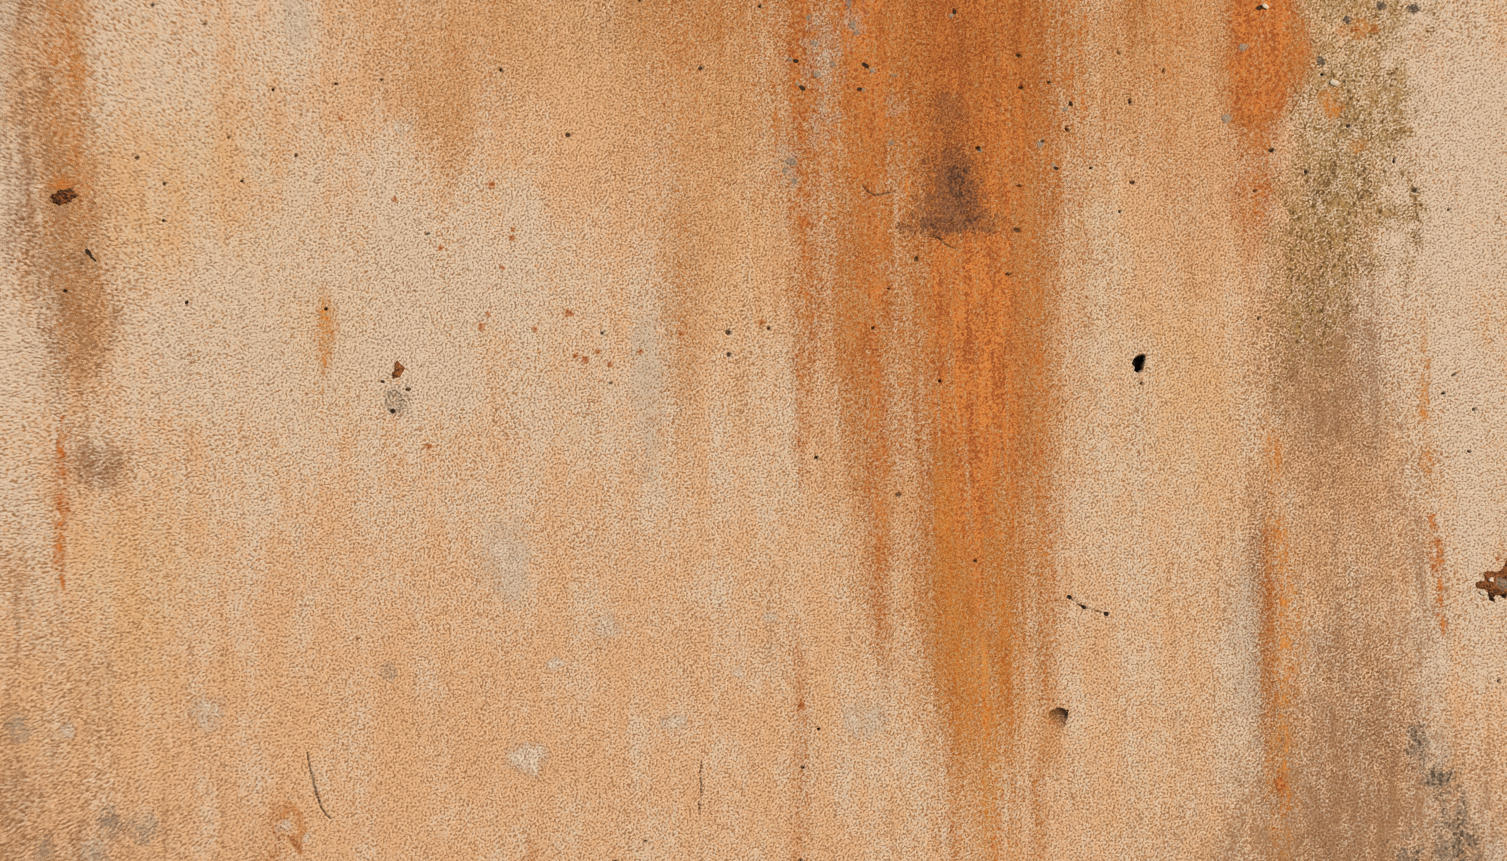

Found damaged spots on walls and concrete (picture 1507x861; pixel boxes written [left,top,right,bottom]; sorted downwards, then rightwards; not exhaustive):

rust [49,179,79,206]
rust [1221,0,1314,242]
rust [734,0,1106,861]
rust [1476,557,1507,602]